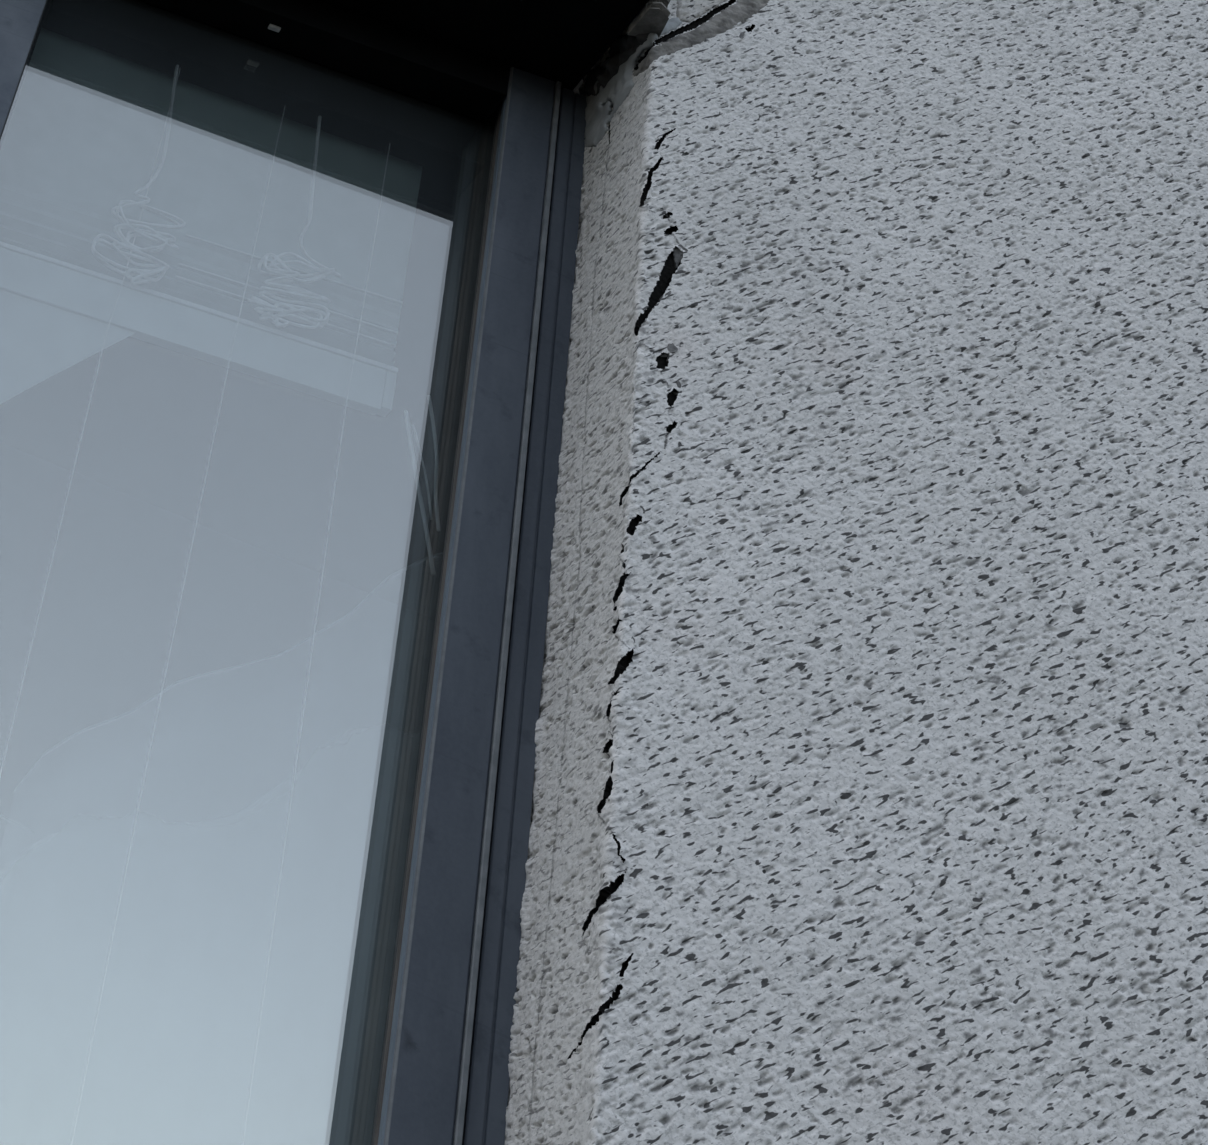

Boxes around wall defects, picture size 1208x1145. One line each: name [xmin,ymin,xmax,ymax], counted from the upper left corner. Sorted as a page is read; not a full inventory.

crack [634,0,736,70]
peeling [676,0,727,23]
crack [640,128,678,235]
crack [569,343,681,1058]